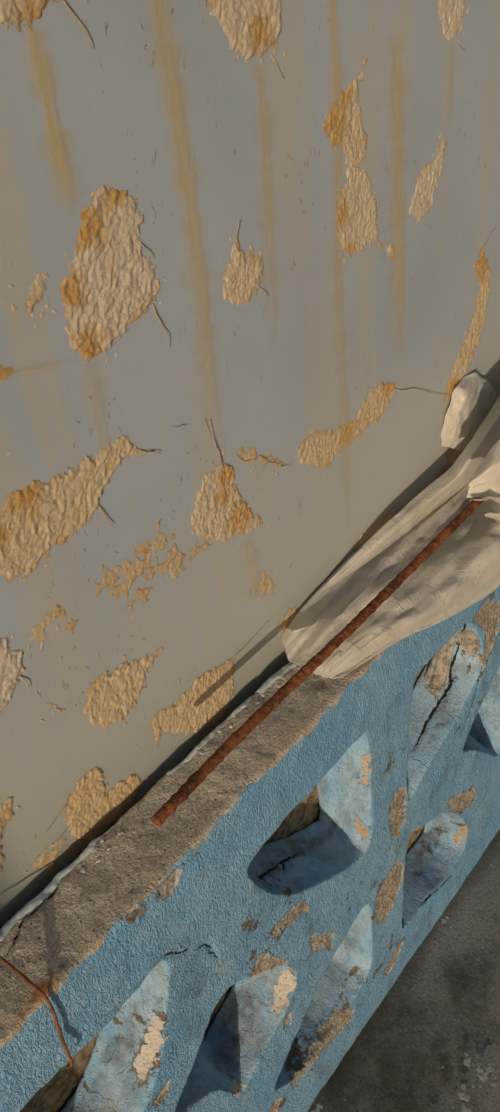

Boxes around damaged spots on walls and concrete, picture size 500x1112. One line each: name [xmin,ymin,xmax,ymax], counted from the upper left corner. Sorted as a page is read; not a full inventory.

peeling [0,0,92,48]
peeling [205,0,287,78]
peeling [323,58,396,265]
peeling [12,185,169,363]
peeling [94,220,495,621]
peeling [0,435,161,583]
peeling [0,604,80,713]
peeling [83,645,163,730]
spalling [150,497,484,826]
crack [413,623,480,749]
crack [9,877,64,950]
spalling [133,1012,169,1081]